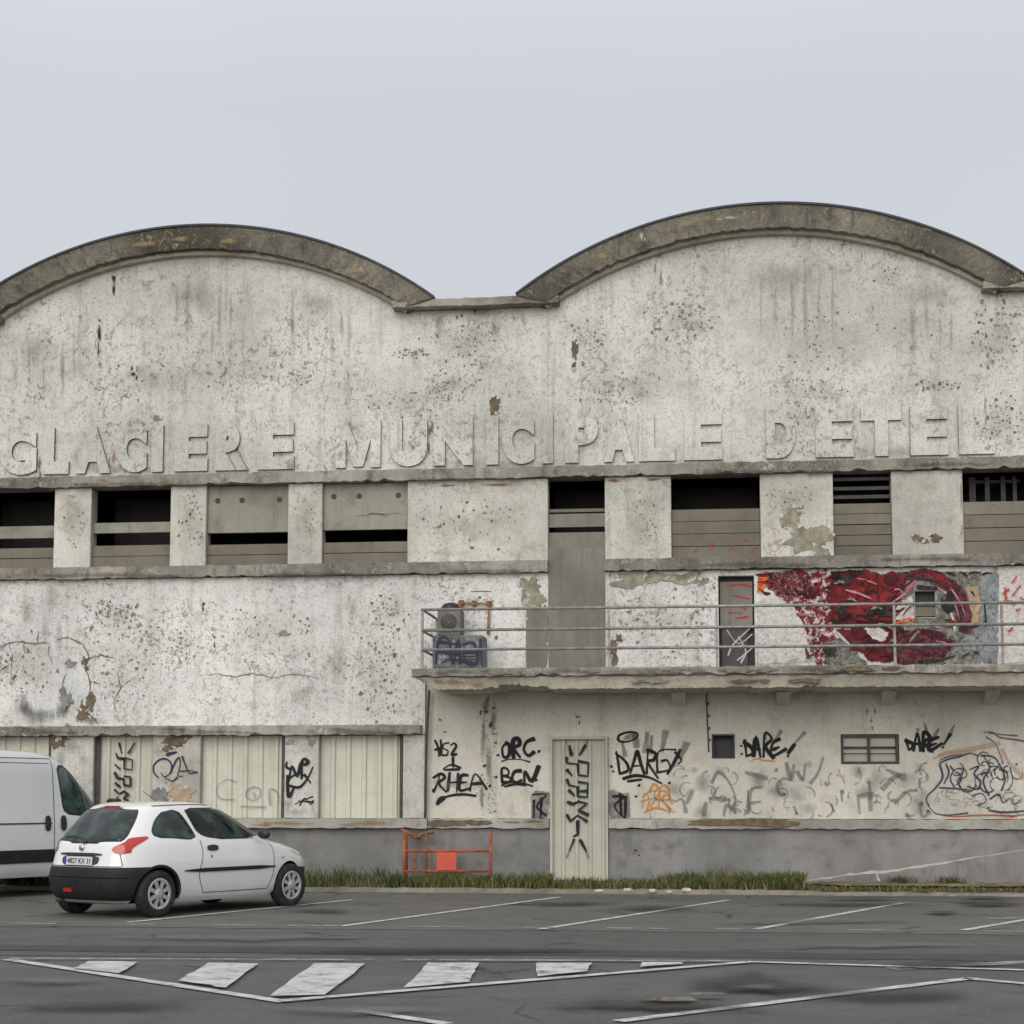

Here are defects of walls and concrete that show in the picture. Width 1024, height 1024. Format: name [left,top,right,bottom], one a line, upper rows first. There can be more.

peeling [345,314,496,418]
spalling [489,394,501,415]
spalling [570,316,605,372]
peeling [766,482,836,556]
peeling [912,532,943,543]
crack [0,636,132,724]
peeling [0,600,199,722]
crack [203,672,321,685]
peeling [482,576,548,676]
peeling [595,571,709,684]